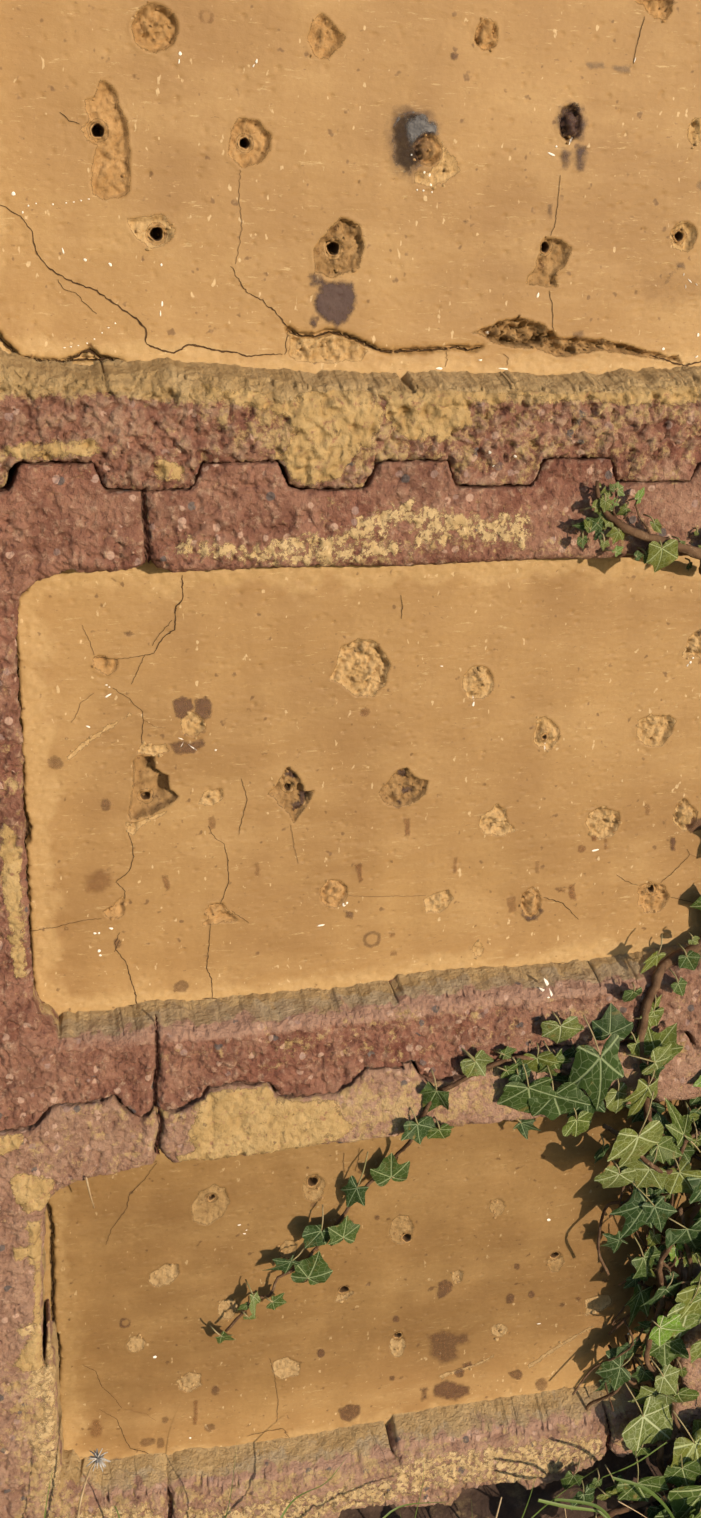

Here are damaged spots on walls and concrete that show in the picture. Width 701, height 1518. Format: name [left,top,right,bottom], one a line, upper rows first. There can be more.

crack [0,170,508,366]
damp [311,275,355,326]
spalling [473,314,682,364]
crack [650,355,701,366]
crack [72,490,184,740]
crack [202,779,249,999]
crack [23,779,162,1243]